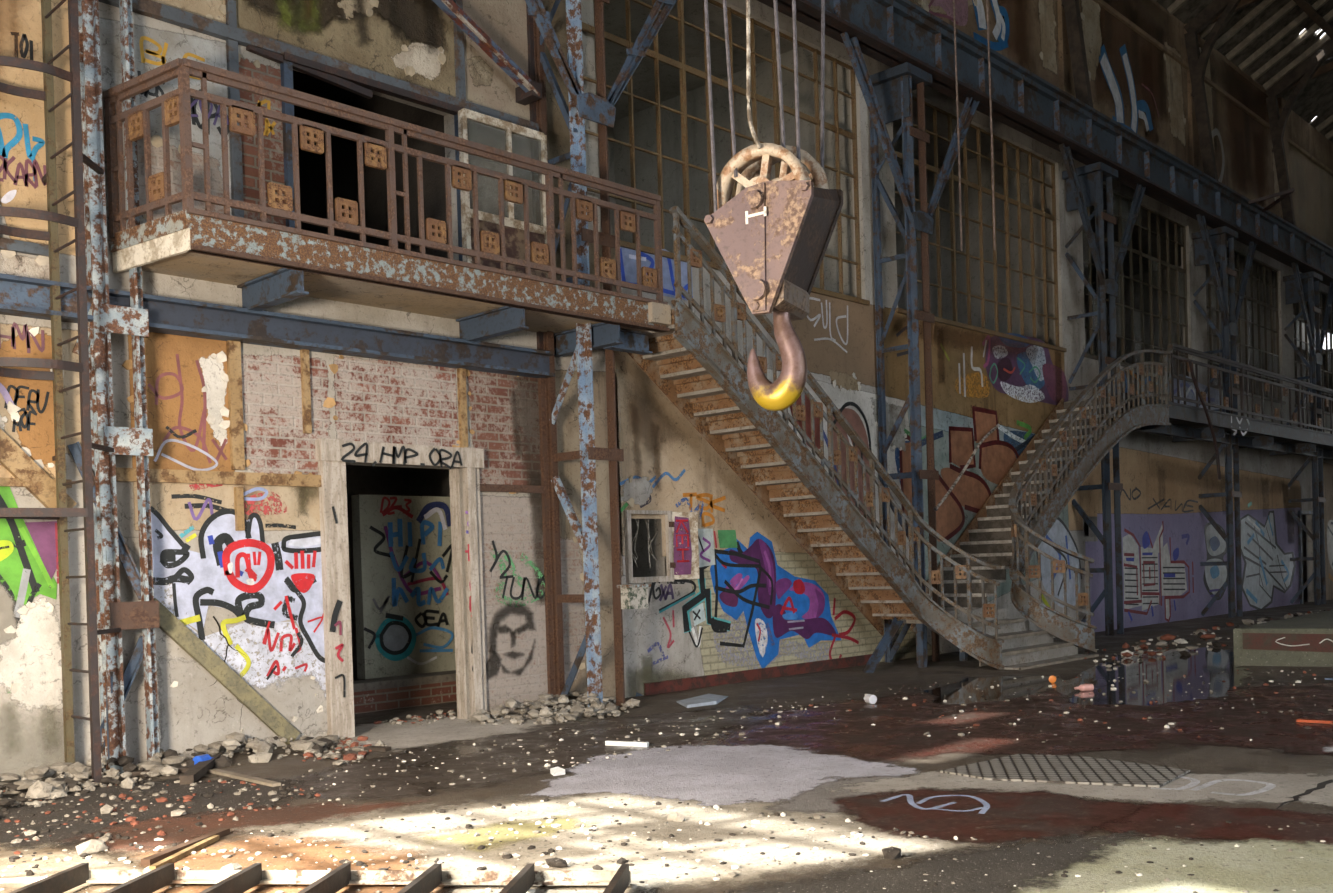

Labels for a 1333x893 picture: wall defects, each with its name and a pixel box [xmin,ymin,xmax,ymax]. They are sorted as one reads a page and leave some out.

leakage [245,0,446,50]
flaking render [391,42,446,81]
flaking render [122,332,541,494]
peeling [0,585,63,712]
crack [1276,779,1333,809]